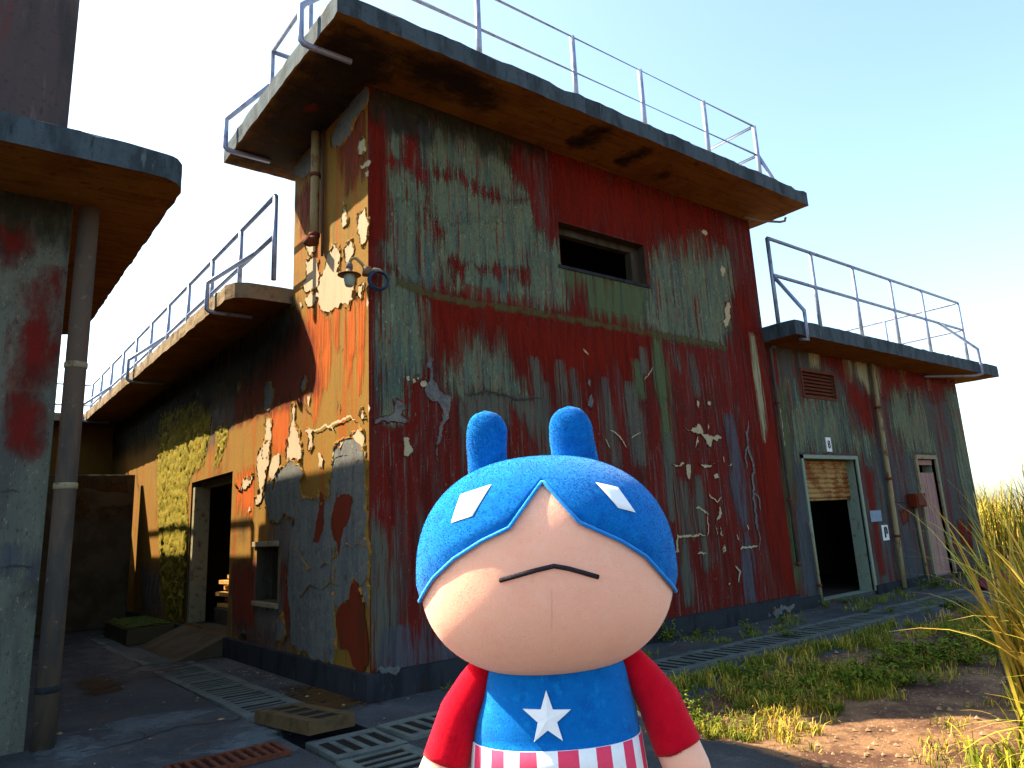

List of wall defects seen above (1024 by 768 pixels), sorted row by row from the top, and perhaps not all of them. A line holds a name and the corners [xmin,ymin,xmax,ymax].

peeling [330,86,371,177]
damp [232,25,722,258]
rust [231,292,366,458]
peeling [234,120,735,664]